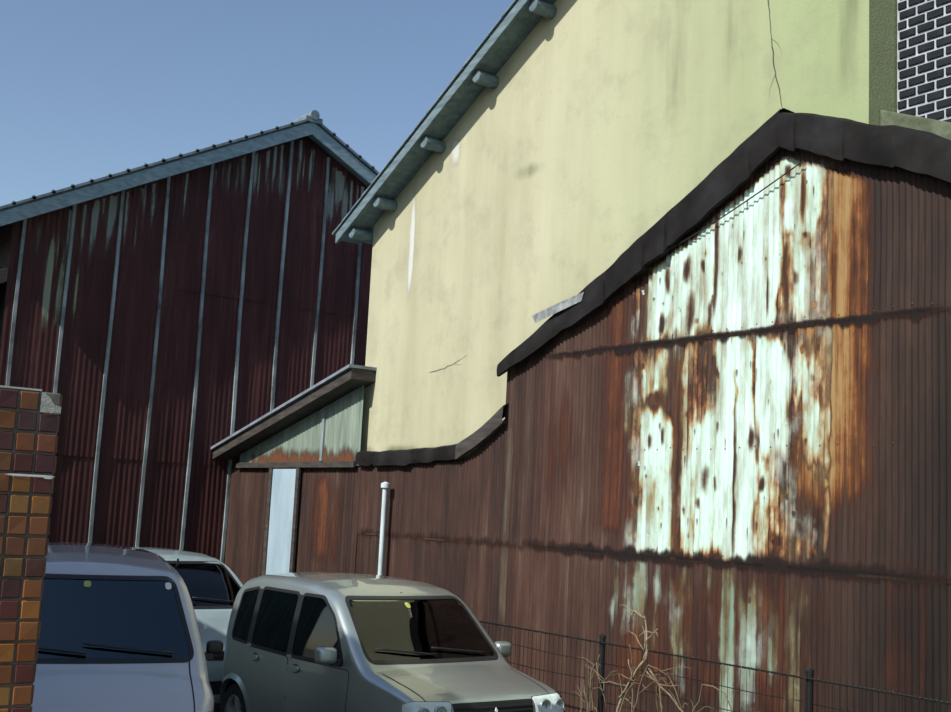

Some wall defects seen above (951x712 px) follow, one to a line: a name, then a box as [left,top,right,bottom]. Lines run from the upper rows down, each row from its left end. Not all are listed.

crack [768,0,782,106]
rust [361,411,948,712]
peeling [610,156,833,712]
rust [545,165,941,534]